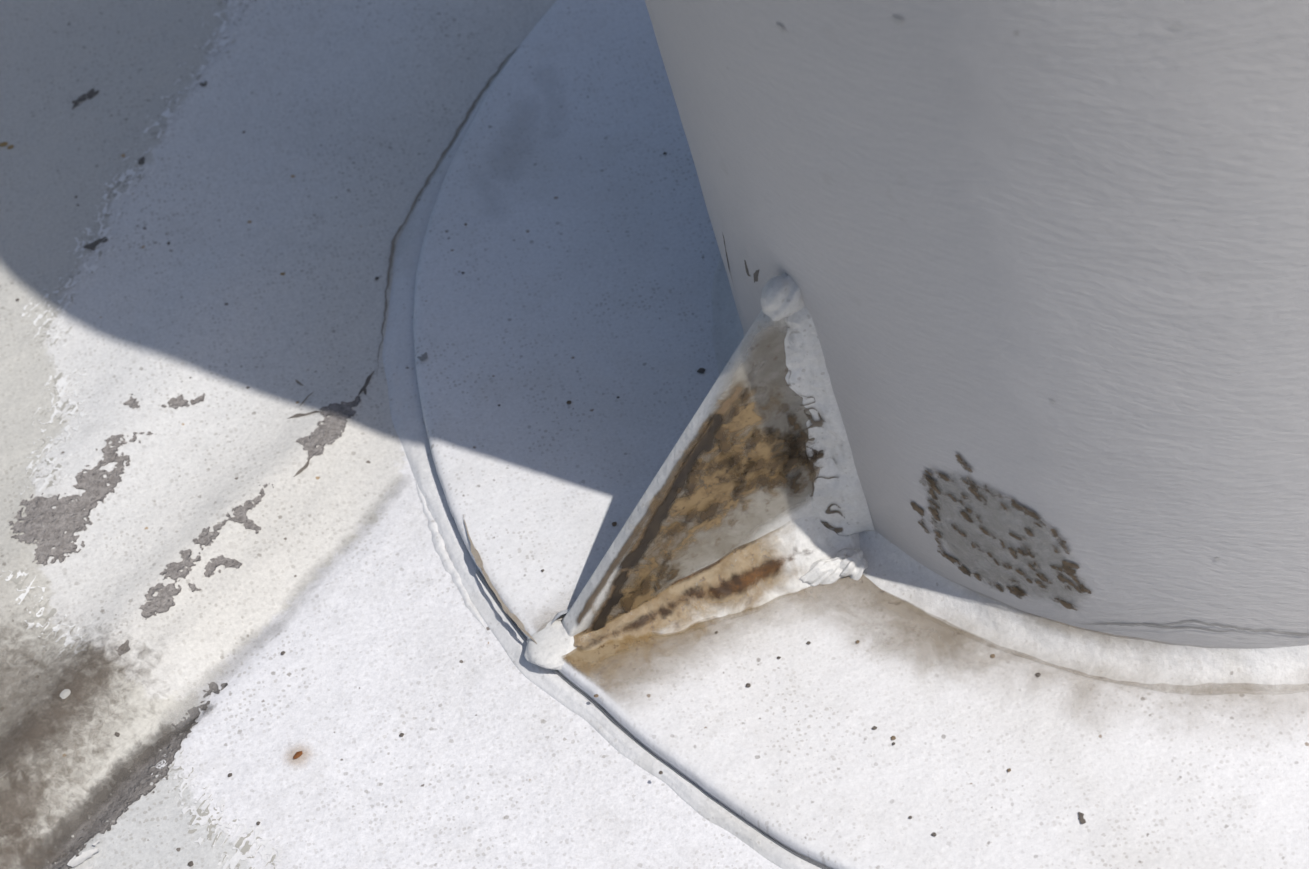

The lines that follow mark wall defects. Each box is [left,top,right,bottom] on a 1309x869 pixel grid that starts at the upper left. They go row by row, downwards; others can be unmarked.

peeling [0,0,274,659]
peeling [296,396,361,461]
water stain [0,652,109,869]